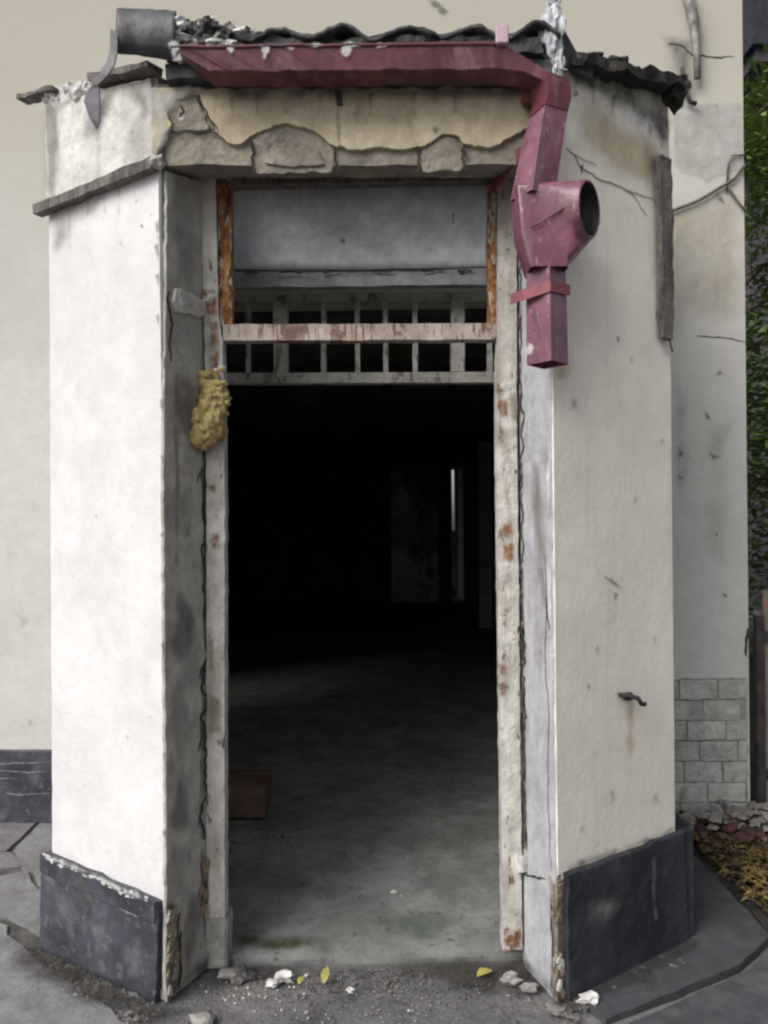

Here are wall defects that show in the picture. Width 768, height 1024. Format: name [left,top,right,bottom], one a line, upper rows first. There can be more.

crack [669,43,734,59]
spalling [166,97,209,134]
spalling [253,128,334,175]
crack [566,148,652,215]
corrosion [502,524,513,558]
crack [197,451,208,840]
spalling [165,904,182,999]
corrosion [504,927,520,950]
spalling [548,875,565,1003]